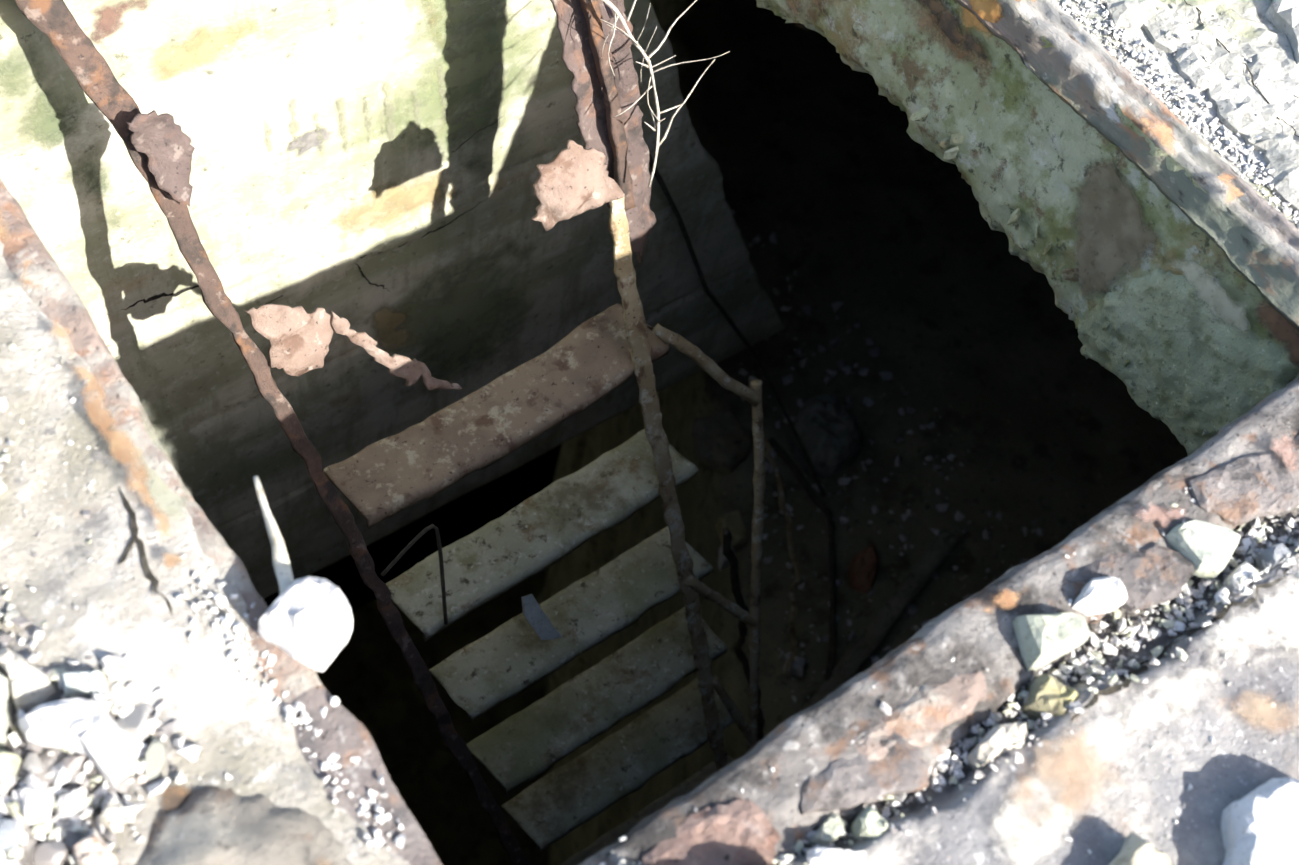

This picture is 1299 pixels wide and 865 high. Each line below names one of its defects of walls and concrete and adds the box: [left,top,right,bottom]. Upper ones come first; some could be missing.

rust [93,0,147,41]
rust [906,0,1002,67]
crack [1184,0,1299,137]
rust [1142,118,1174,153]
rust [1218,174,1244,202]
rust [77,368,170,536]
crack [118,486,172,615]
rust [164,554,183,568]